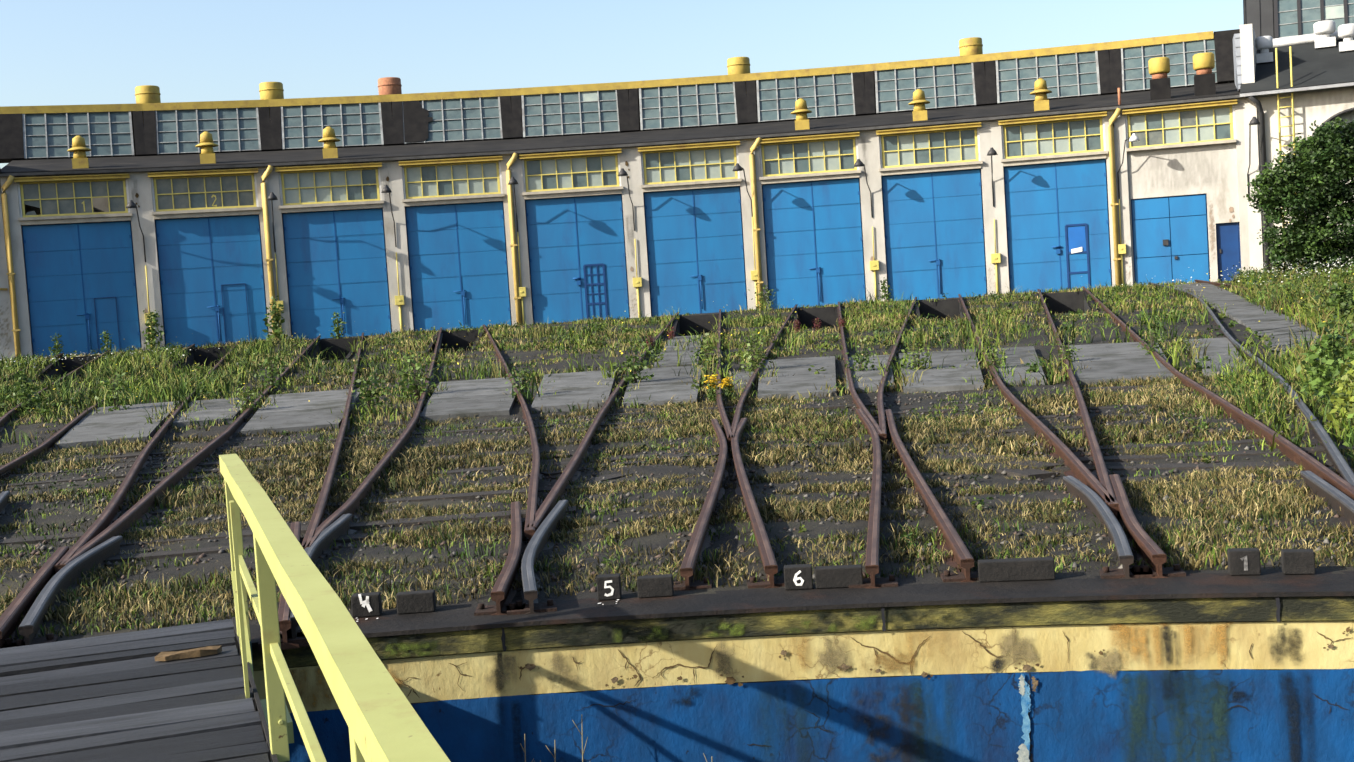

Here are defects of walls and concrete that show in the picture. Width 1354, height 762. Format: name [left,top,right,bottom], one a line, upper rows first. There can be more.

crack [393,675,419,697]
leakage [487,653,515,690]
crack [575,646,717,716]
crack [851,631,1033,762]
peeling [1014,663,1039,762]
leakage [1271,631,1300,655]
leakage [1281,677,1311,762]